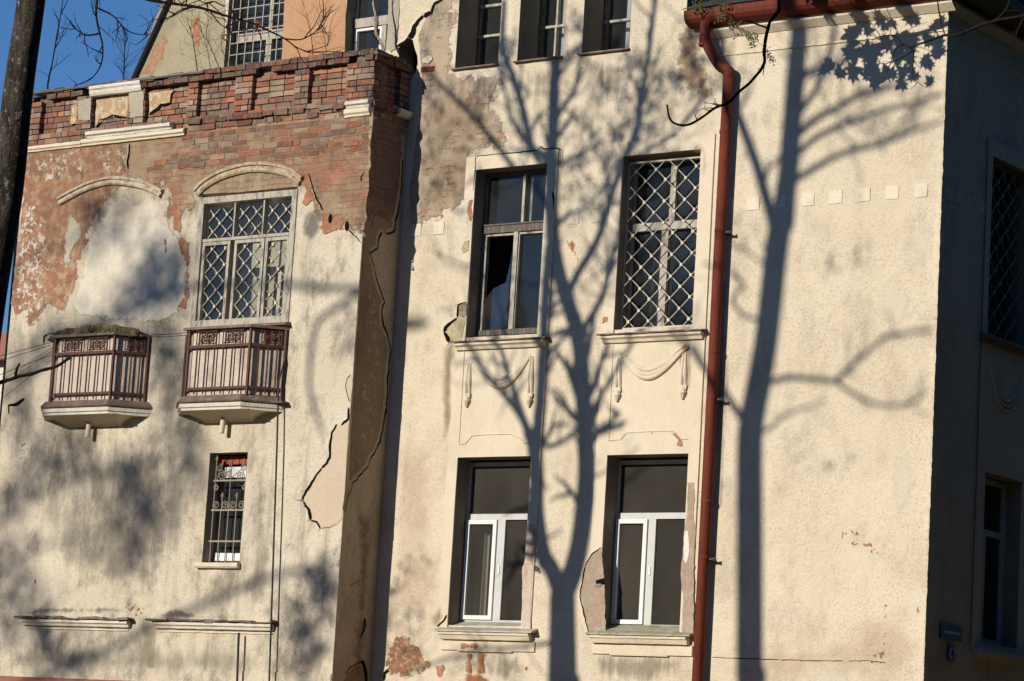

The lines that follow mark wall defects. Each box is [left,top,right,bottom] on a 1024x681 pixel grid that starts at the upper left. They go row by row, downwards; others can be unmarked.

crack [397,0,442,46]
flaking render [11,0,507,528]
crack [299,159,403,531]
crack [346,618,389,681]
spalling [580,548,606,631]
spalling [681,482,695,632]